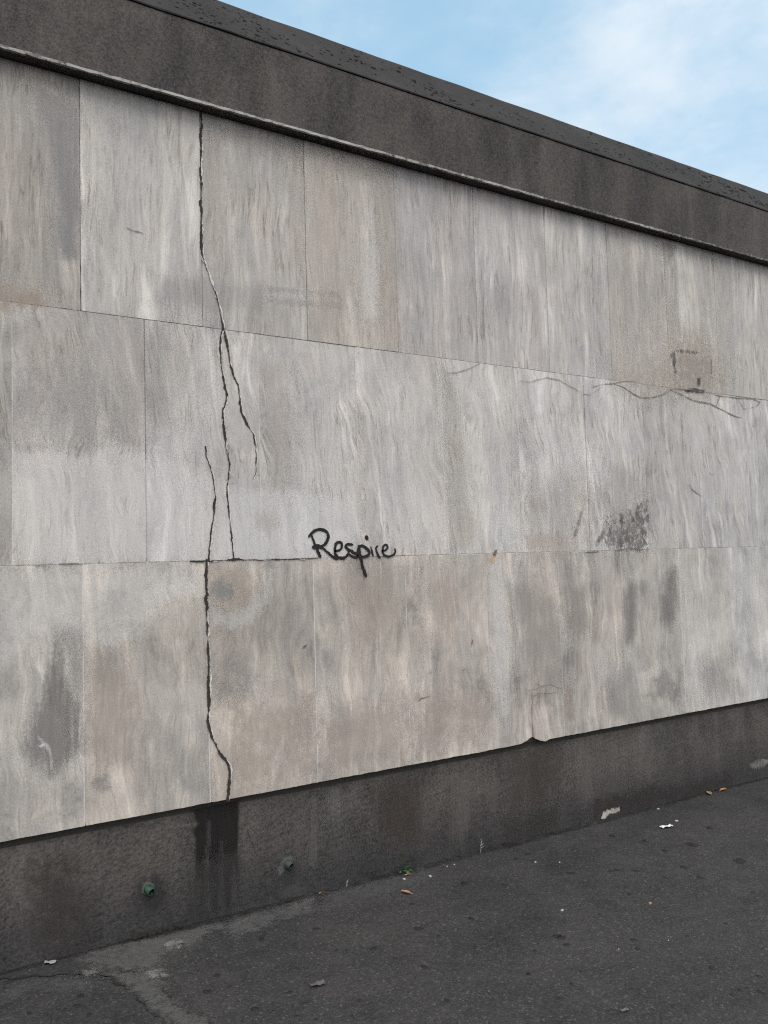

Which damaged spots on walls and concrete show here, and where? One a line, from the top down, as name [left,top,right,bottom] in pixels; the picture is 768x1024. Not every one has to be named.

crack [189,111,318,801]
crack [525,377,760,418]
leakage [188,801,240,920]